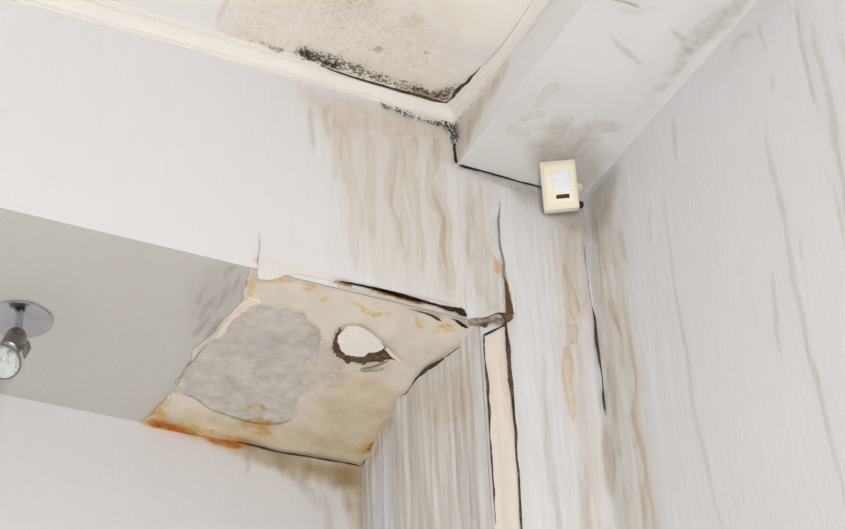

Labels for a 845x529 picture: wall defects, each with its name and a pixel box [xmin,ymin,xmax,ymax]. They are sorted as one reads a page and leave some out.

water stain [294,46,454,100]
water stain [381,102,459,154]
peeling [140,268,521,529]
crack [330,206,523,529]